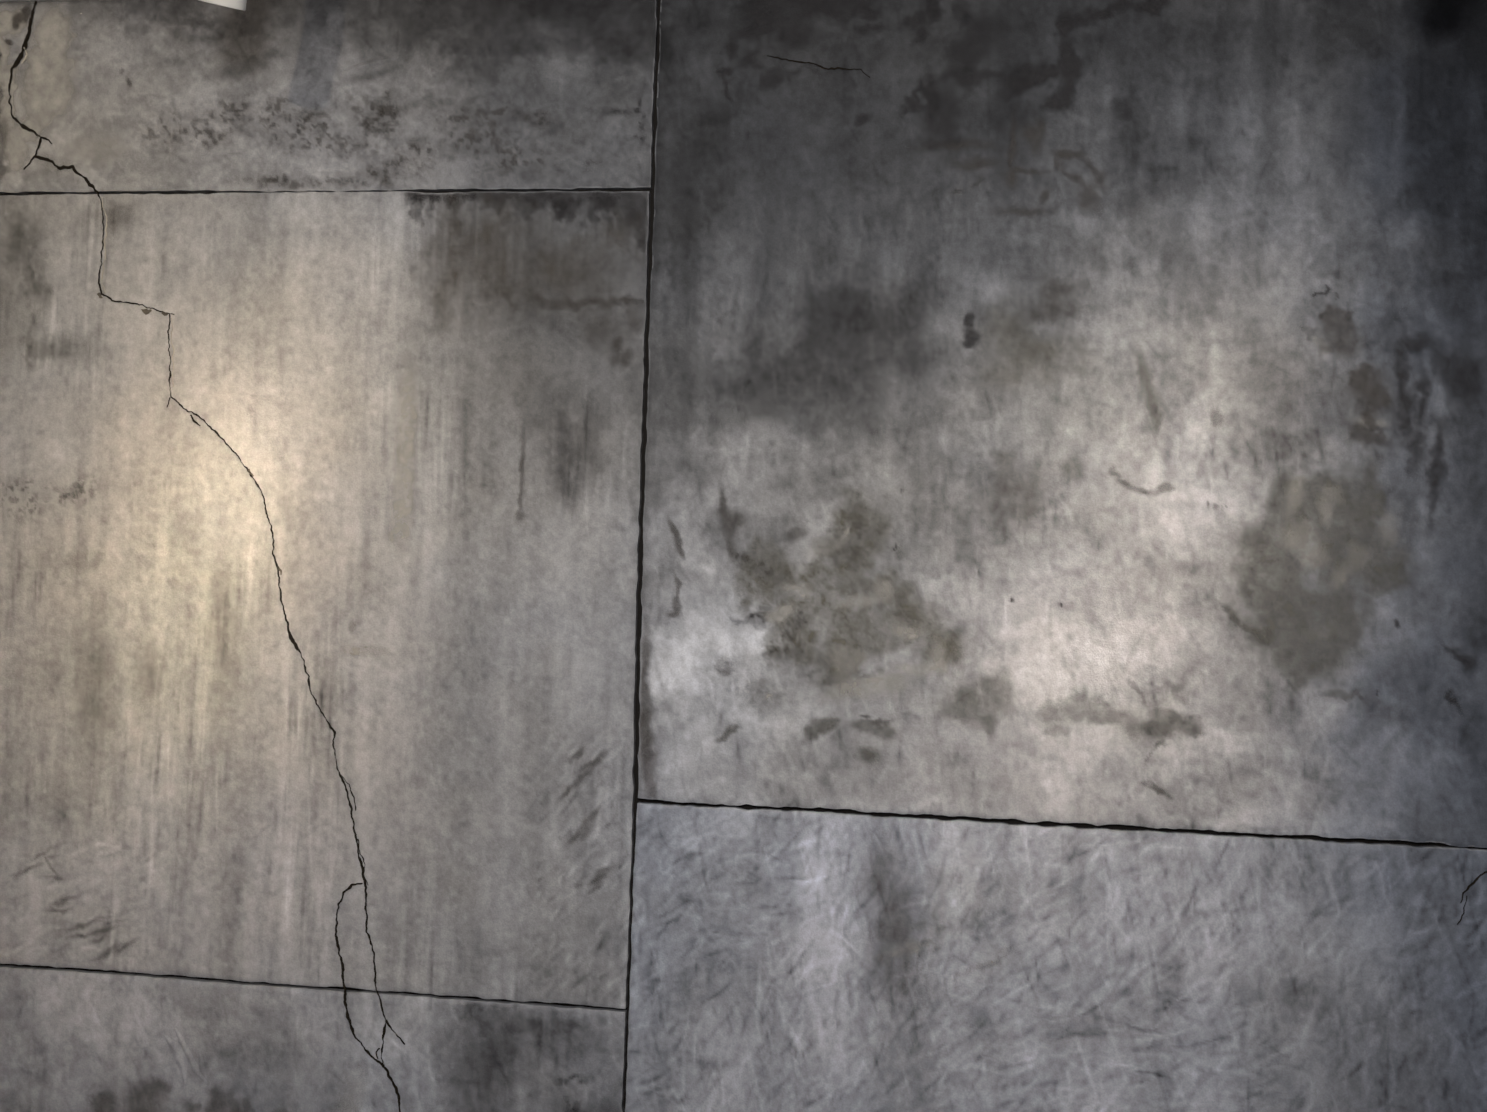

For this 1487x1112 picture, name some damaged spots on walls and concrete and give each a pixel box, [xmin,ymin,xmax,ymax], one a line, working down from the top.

damp [407,192,646,300]
crack [8,1,405,1112]
damp [737,505,960,682]
damp [1241,464,1406,686]
damp [945,677,1008,734]